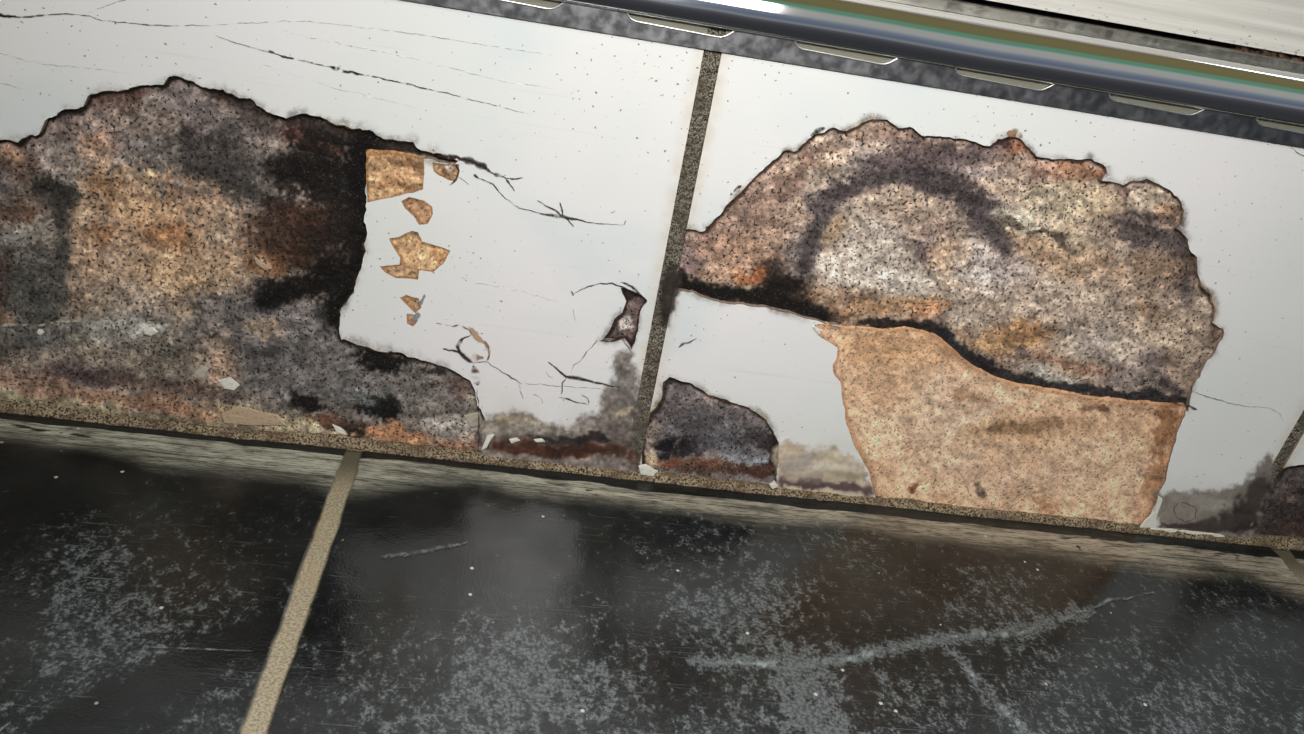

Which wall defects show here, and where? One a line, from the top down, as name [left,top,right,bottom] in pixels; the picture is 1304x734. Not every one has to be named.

crack [0,0,534,112]
crack [450,165,626,227]
spalling [0,76,522,451]
spalling [678,116,1222,410]
crack [437,323,622,405]
spalling [638,377,778,489]
spalling [1252,465,1304,539]